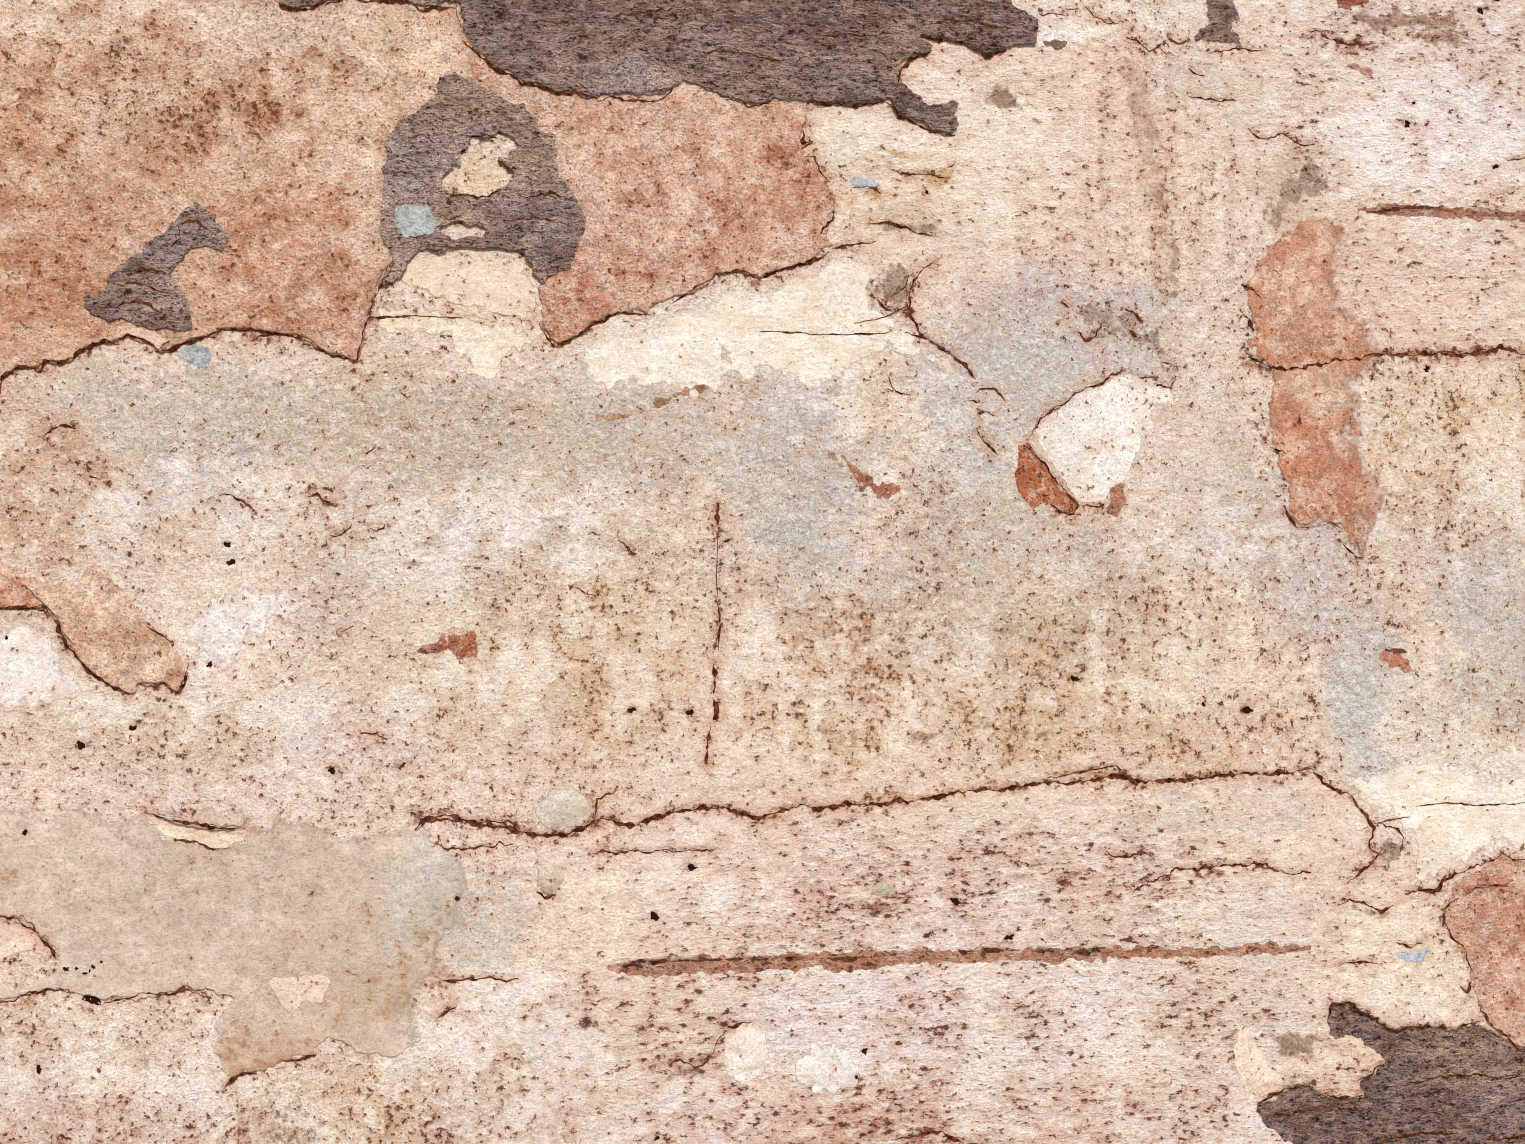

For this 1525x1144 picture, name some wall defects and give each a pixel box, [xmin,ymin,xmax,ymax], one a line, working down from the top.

flaking render [0,0,1039,400]
flaking render [0,562,300,712]
crack [704,503,731,764]
flaking render [1015,374,1174,514]
flaking render [1247,218,1385,556]
crack [1284,507,1364,559]
crack [0,915,209,1003]
flaking render [0,807,472,1080]
crack [225,1054,316,1087]
crack [410,765,1525,1103]
spalling [1257,759,1525,1144]